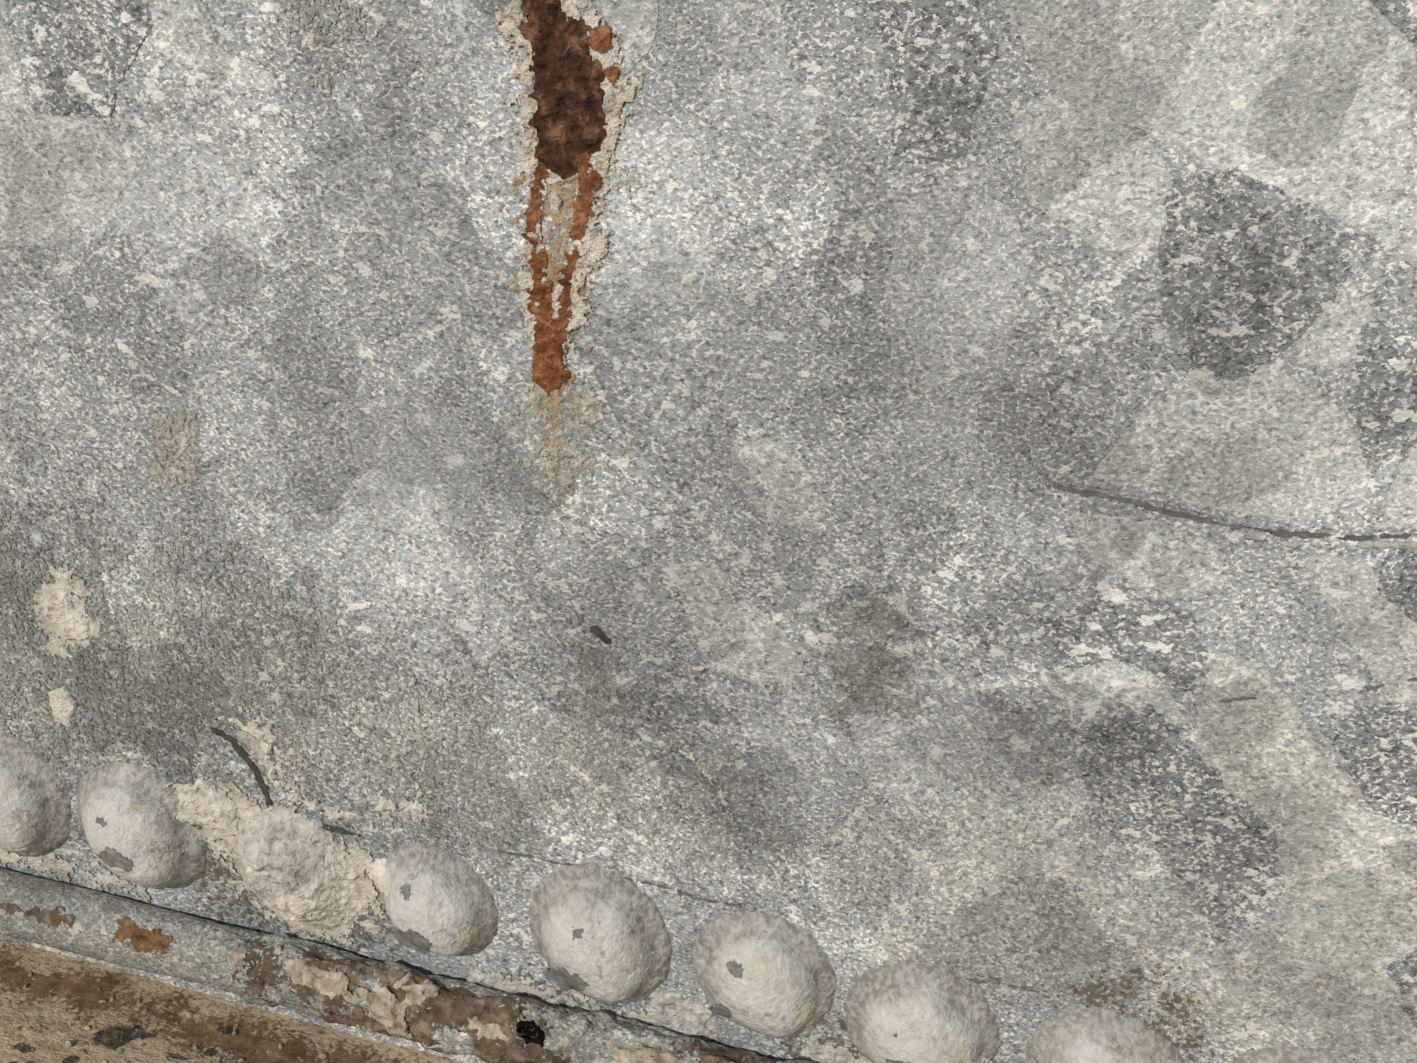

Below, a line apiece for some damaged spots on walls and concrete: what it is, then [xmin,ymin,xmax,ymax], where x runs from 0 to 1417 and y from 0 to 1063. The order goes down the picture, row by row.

rust [494,0,646,540]
peeling [26,558,111,664]
peeling [176,777,363,927]
rust [0,903,75,929]
rust [112,916,173,955]
rust [231,935,570,1063]
rust [670,1037,776,1063]